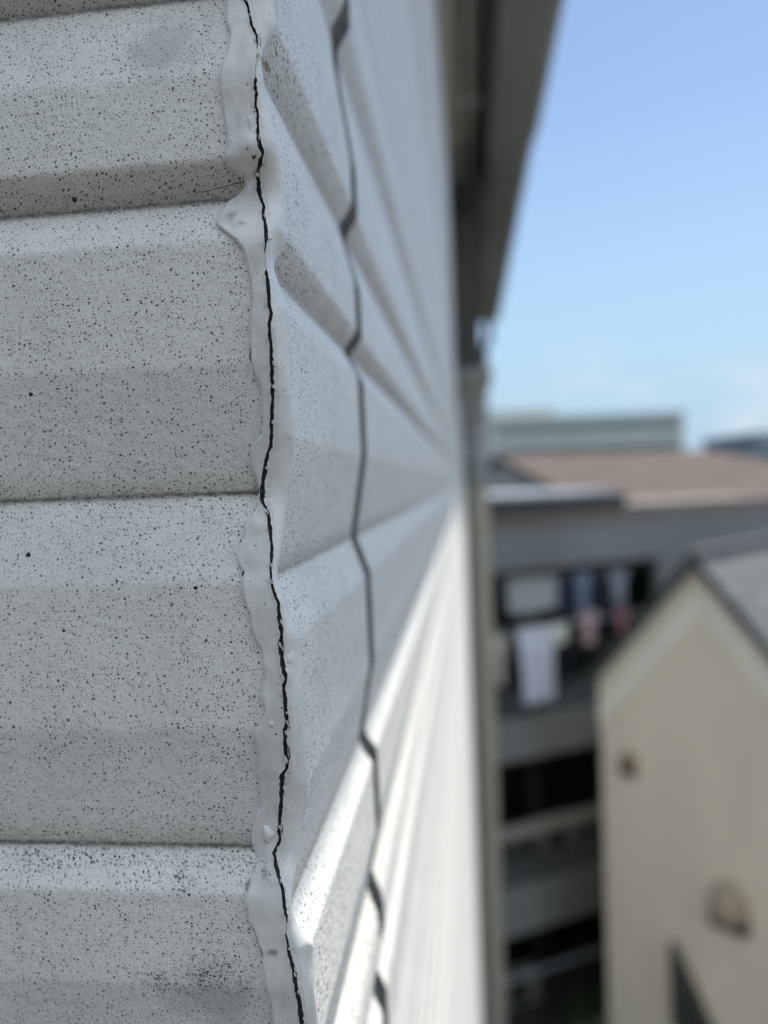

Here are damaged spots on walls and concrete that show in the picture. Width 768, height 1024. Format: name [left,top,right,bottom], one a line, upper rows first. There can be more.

crack [243,0,262,46]
crack [184,79,304,1024]